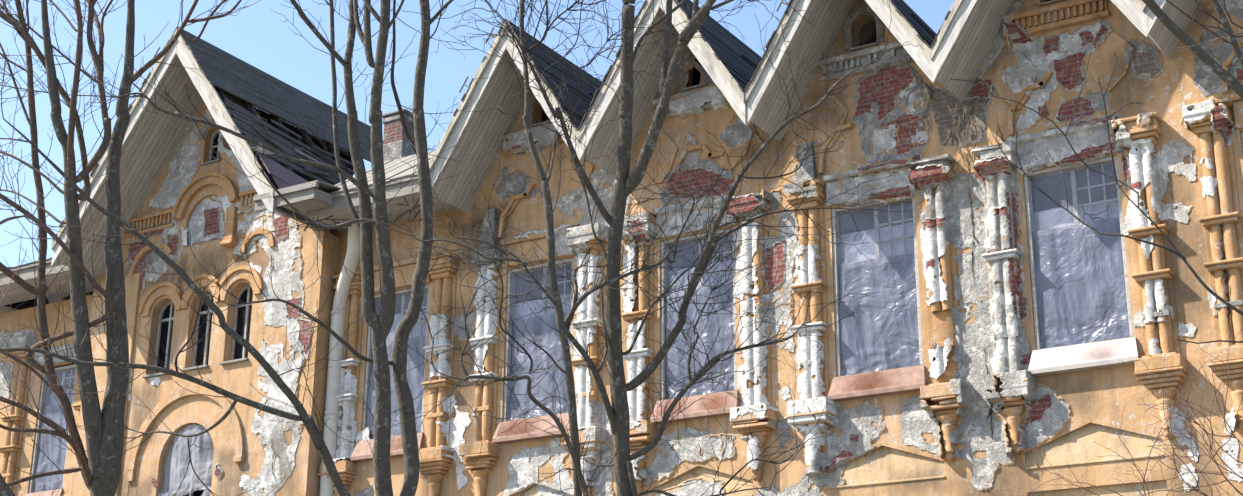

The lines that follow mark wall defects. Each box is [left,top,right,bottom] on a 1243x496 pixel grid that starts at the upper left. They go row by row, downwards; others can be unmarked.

flaking render [492,0,1243,496]
crack [969,188,978,291]
flaking render [125,108,313,496]
peeling [436,395,476,490]
crack [983,345,993,448]